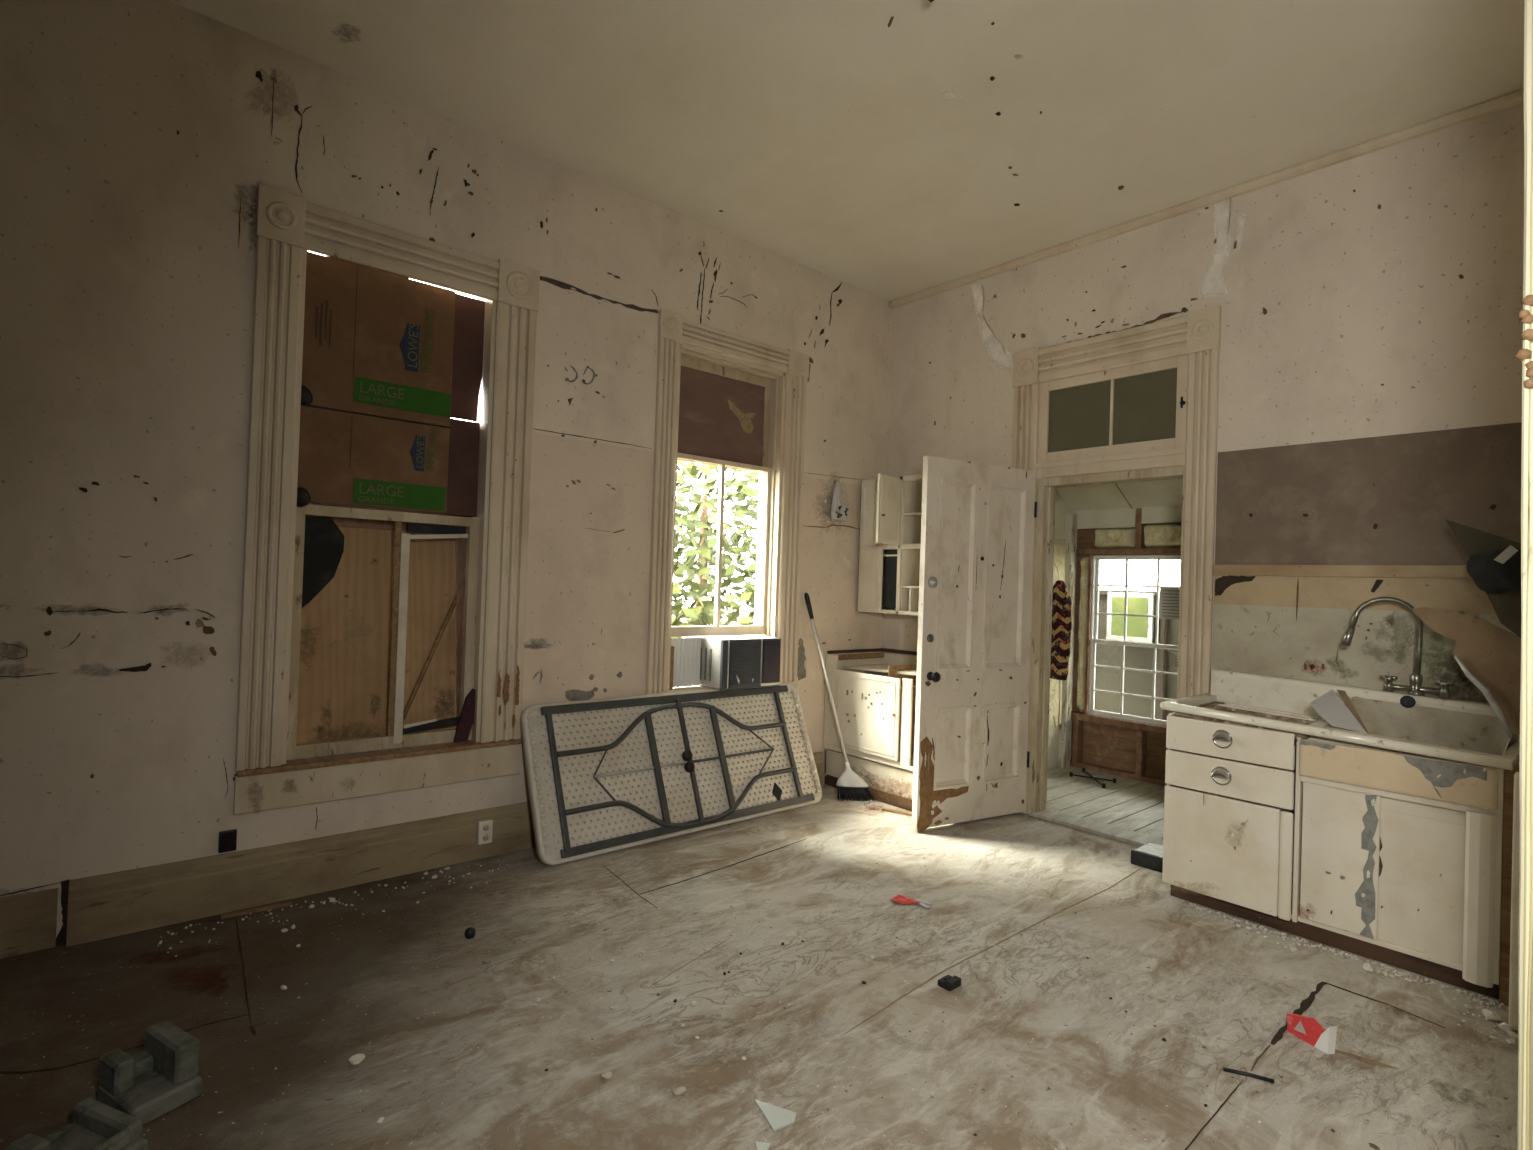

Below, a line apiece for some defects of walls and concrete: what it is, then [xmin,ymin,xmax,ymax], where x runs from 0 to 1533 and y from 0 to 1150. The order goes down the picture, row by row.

crack [294,105,325,193]
leakage [46,606,214,617]
leakage [82,663,151,676]
peeling [917,736,998,832]